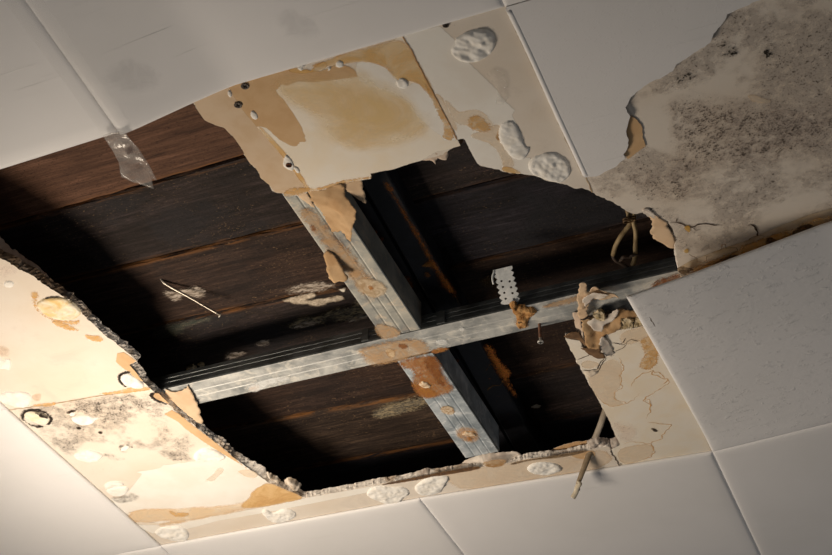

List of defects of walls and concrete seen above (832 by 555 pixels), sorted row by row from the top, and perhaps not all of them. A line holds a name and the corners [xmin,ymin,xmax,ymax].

damp [284,169,368,196]
damp [284,45,501,146]
peeling [257,26,532,191]
damp [502,157,518,173]
damp [613,0,832,272]
rust [385,183,458,299]
damp [32,292,79,331]
damp [18,372,169,452]
rust [484,345,516,395]
peeling [511,326,711,465]
peeling [111,456,480,533]